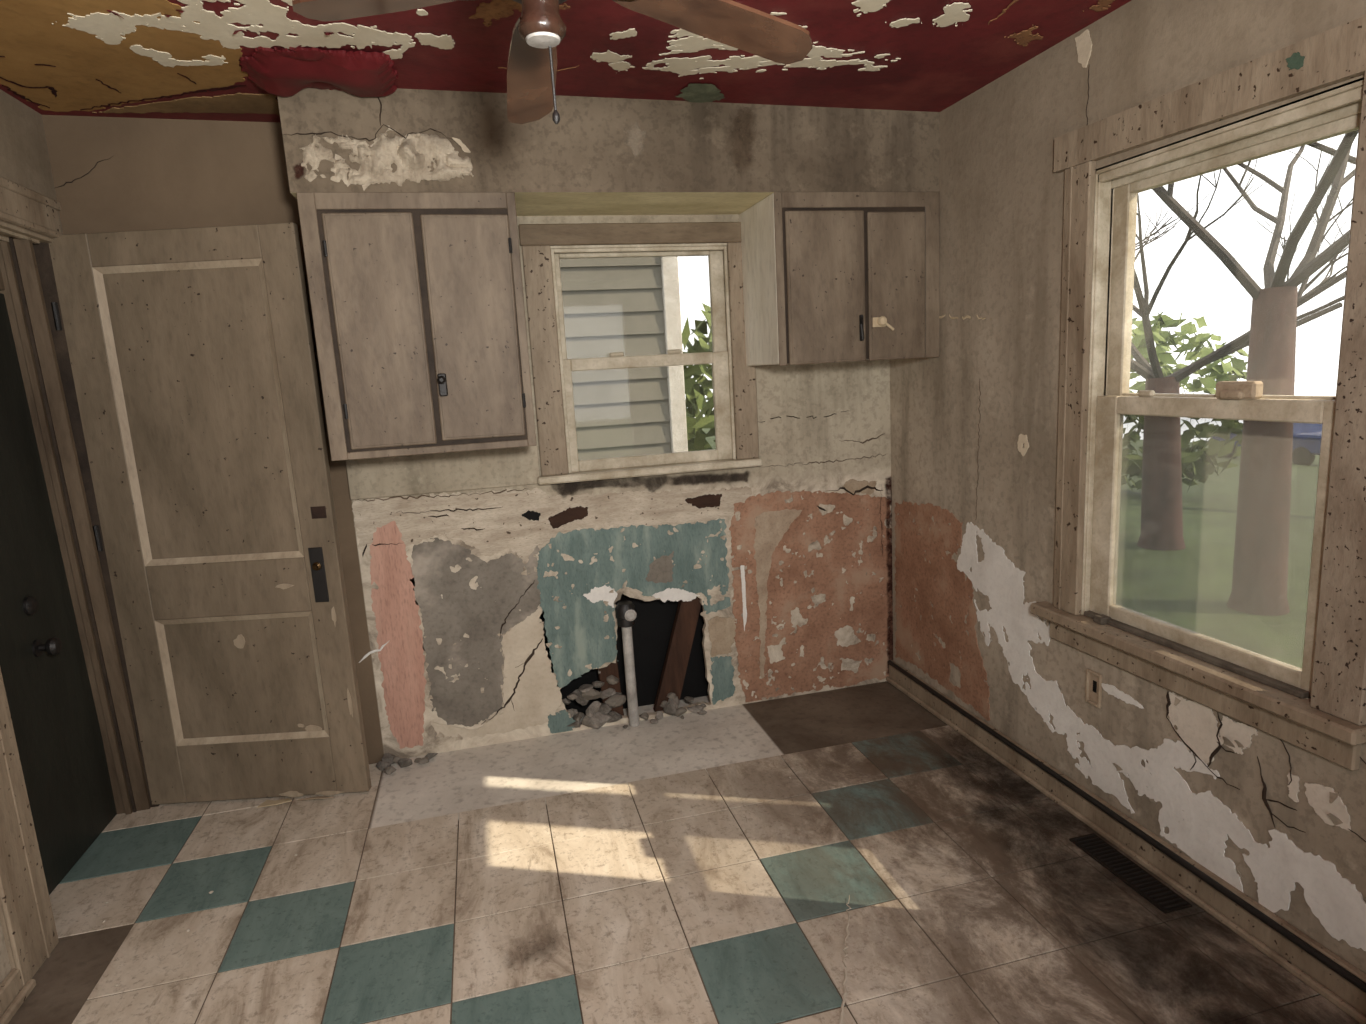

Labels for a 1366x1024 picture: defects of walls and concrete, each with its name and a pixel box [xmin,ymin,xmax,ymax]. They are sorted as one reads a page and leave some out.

peeling [0,0,455,115]
peeling [469,0,522,27]
peeling [590,25,901,79]
peeling [852,0,972,28]
peeling [1004,25,1043,46]
flaking render [1075,29,1093,68]
crack [500,580,535,637]
crack [481,638,543,725]
flaking render [352,479,1366,951]
crack [1166,691,1304,832]